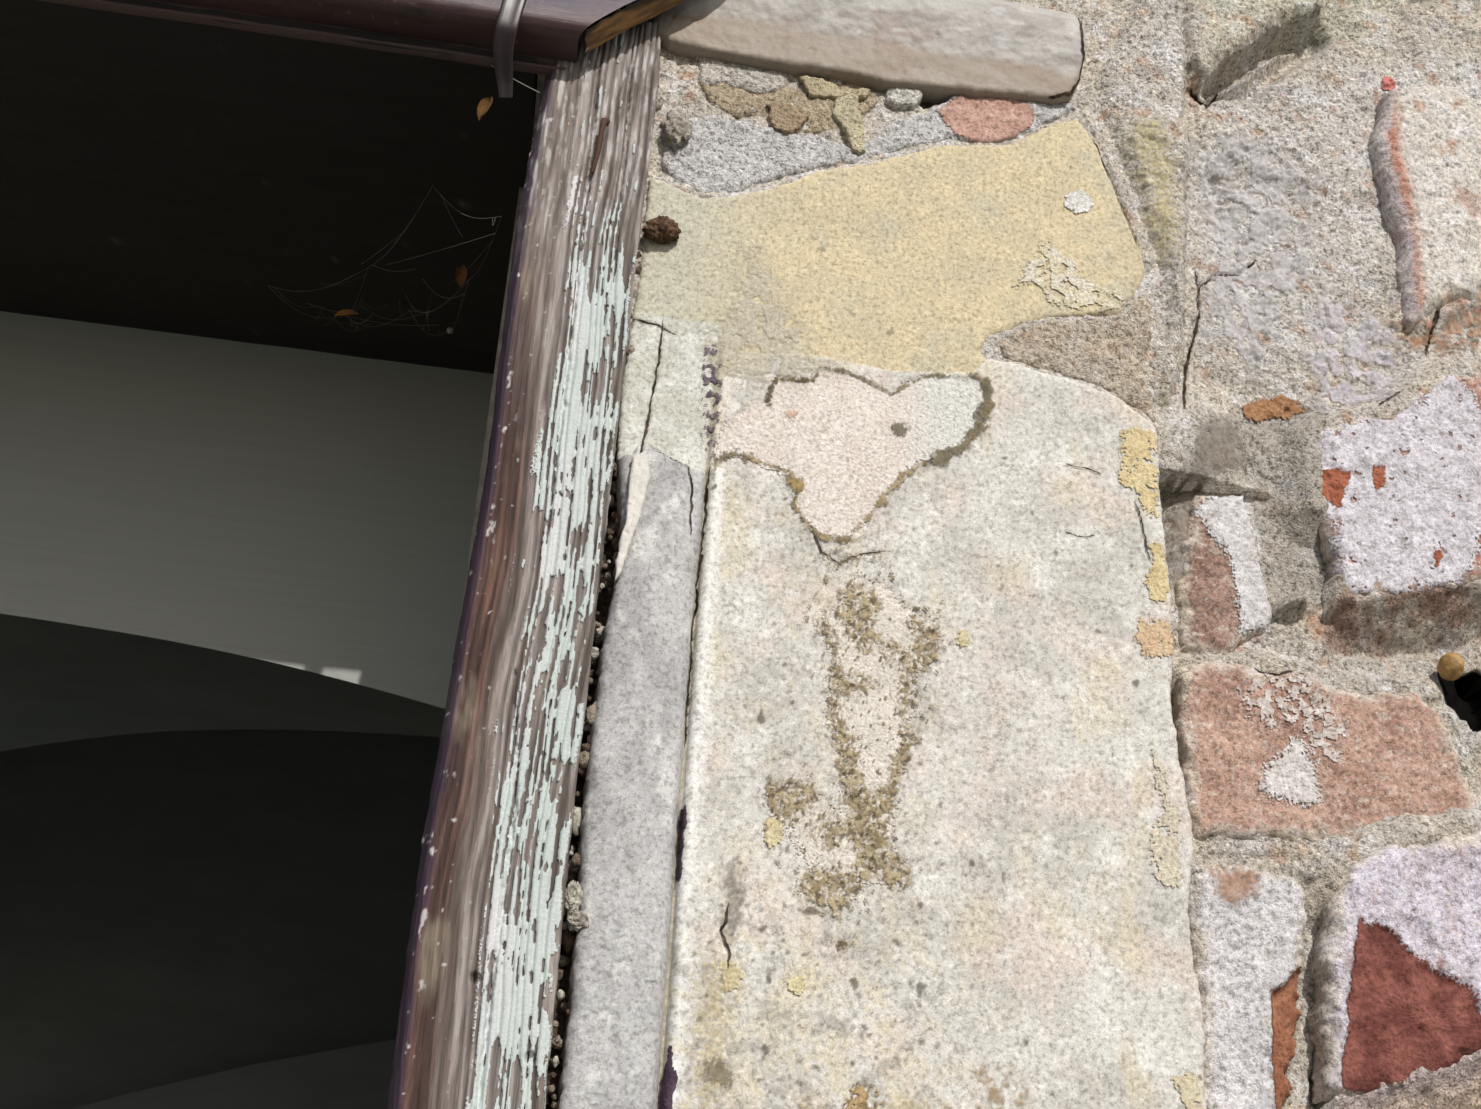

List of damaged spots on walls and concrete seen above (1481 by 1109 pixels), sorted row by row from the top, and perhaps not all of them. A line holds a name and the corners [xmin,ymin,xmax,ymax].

crack [1183,260,1256,409]
peeling [465,85,650,1109]
crack [632,319,710,744]
spalling [701,343,985,538]
spalling [1320,468,1351,509]
spalling [1373,464,1386,491]
spalling [1437,671,1481,732]
crack [675,809,683,879]
spalling [1340,917,1481,1094]